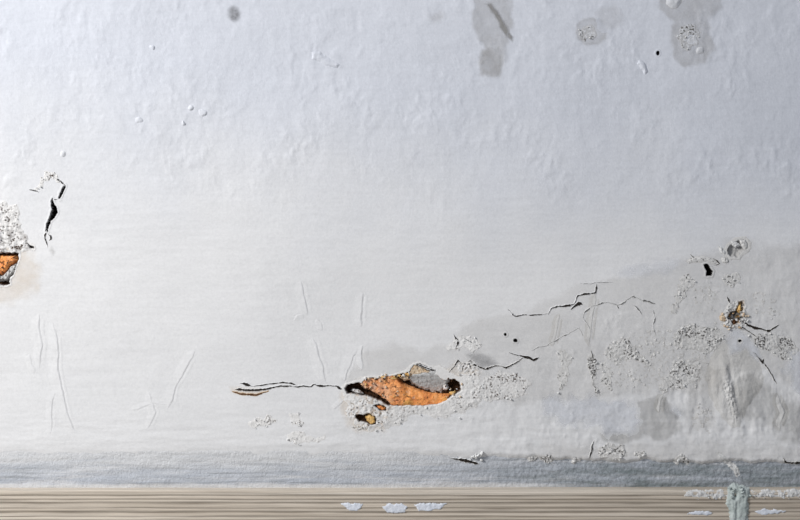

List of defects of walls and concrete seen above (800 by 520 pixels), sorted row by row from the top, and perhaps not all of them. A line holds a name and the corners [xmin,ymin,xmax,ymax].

leakage [489,4,512,39]
spalling [0,200,37,288]
crack [29,178,68,247]
crack [232,381,342,396]
spalling [340,335,532,432]
crack [449,282,656,373]
peeling [587,236,799,395]
leakage [730,330,759,357]